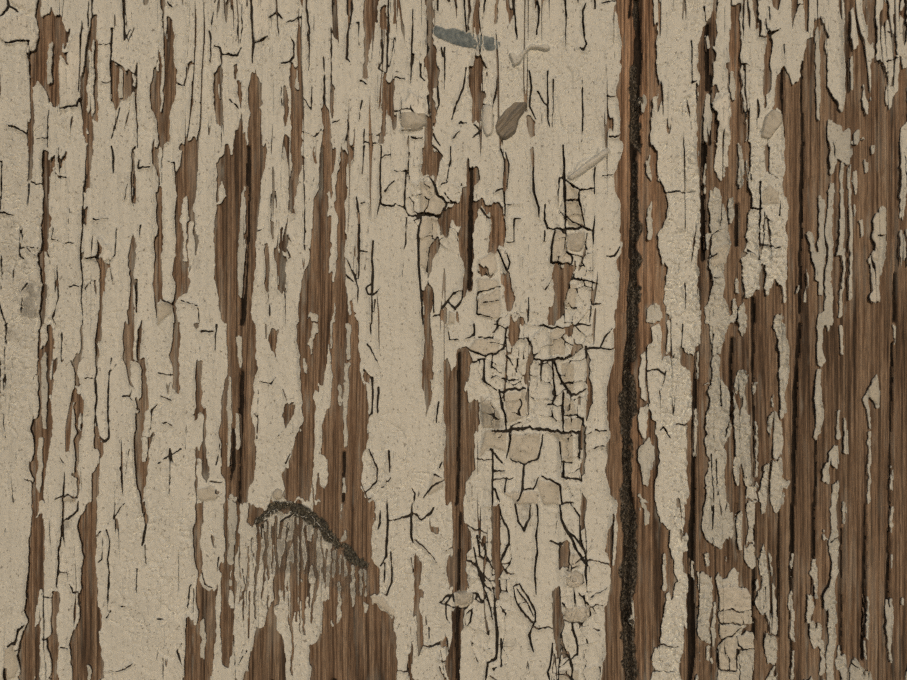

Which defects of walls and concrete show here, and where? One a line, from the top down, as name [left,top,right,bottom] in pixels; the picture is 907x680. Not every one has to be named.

peeling [2,150,60,680]
crack [0,159,99,313]
peeling [0,0,100,193]
peeling [70,426,104,680]
crack [88,0,177,203]
crack [86,359,195,479]
peeling [151,0,201,394]
peeling [184,63,427,680]
crack [209,0,666,680]
peeling [601,0,801,680]
crack [659,7,889,680]
crack [871,209,895,505]